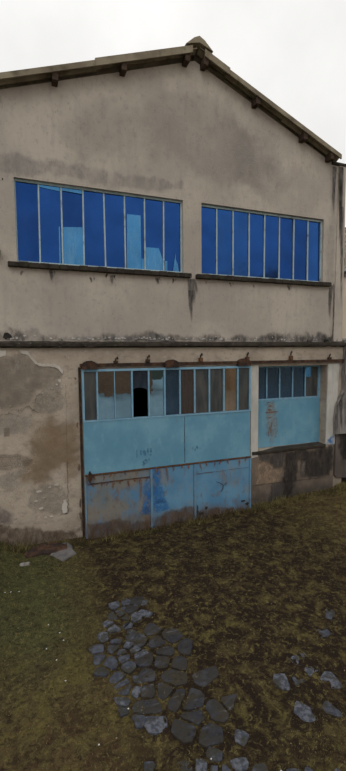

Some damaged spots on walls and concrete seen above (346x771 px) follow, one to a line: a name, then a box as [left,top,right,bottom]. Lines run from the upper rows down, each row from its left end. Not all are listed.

leakage [329,167,344,326]
spalling [0,349,63,397]